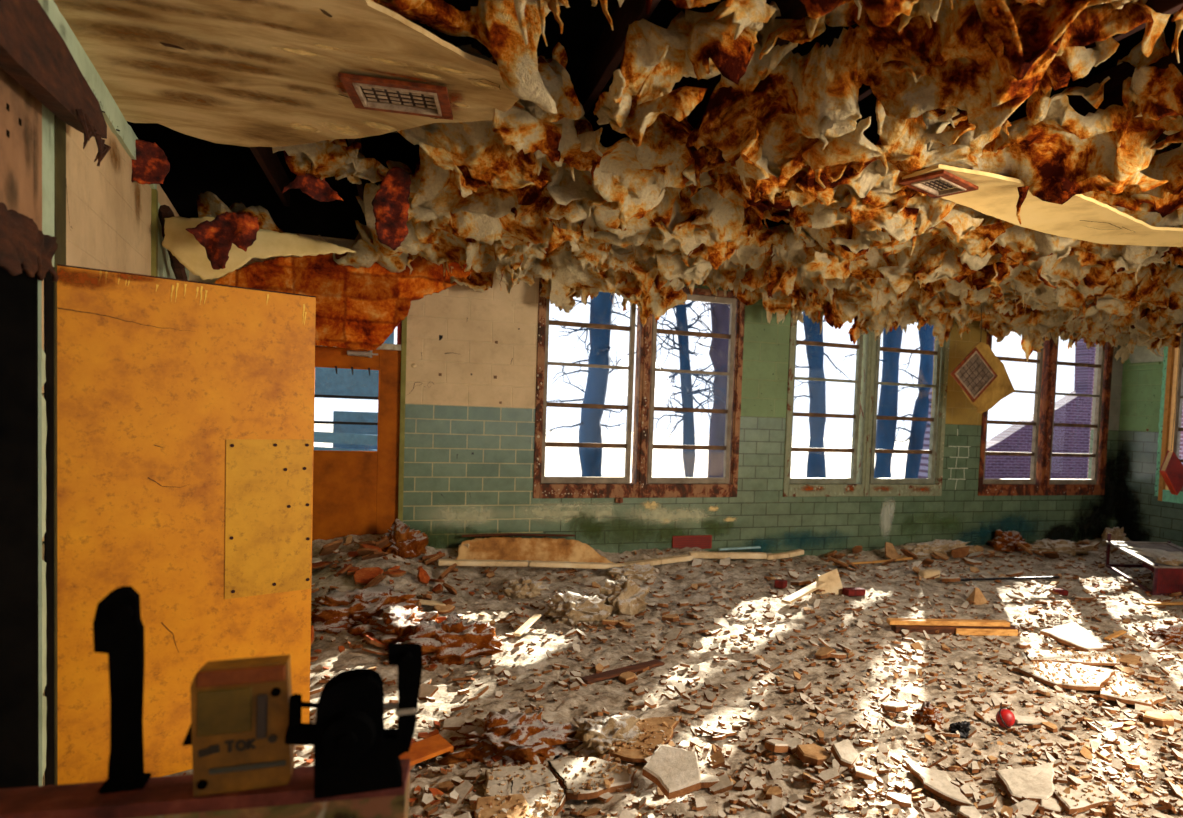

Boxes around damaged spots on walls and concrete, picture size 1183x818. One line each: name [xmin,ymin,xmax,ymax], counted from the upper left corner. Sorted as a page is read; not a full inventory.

water stain [961,444,1150,544]